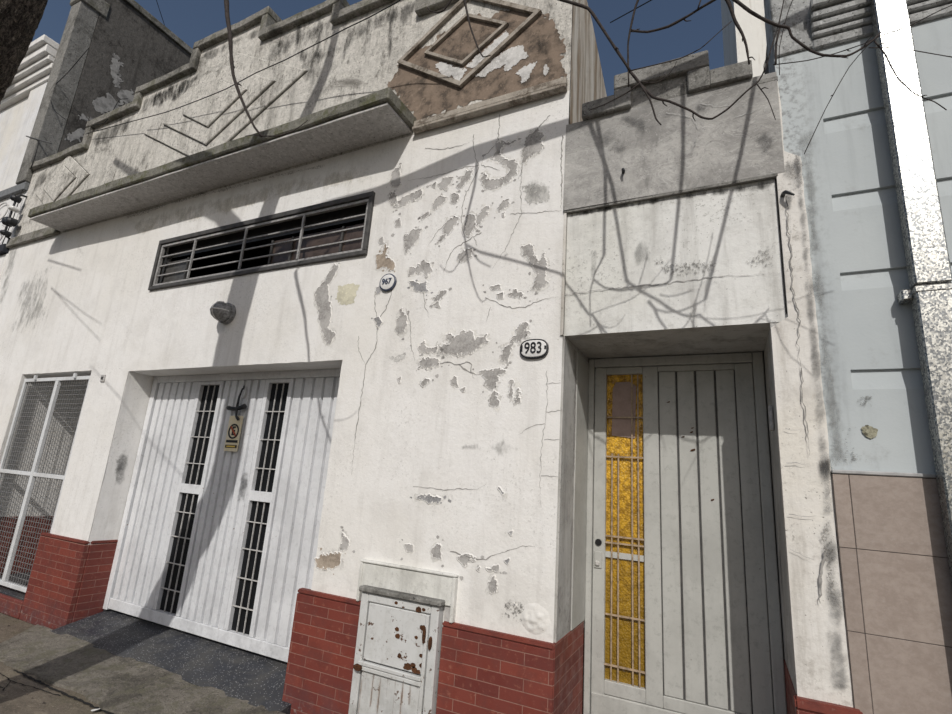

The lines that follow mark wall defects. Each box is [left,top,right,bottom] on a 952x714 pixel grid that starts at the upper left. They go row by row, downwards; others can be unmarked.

peeling [64,53,134,142]
peeling [387,10,567,121]
crack [408,115,500,273]
peeling [373,127,551,309]
crack [496,115,564,263]
peeling [313,260,360,348]
crack [351,284,428,475]
peeling [371,307,532,412]
crack [437,361,480,377]
crack [520,371,560,503]
peeling [314,526,355,575]
rust [397,653,422,674]